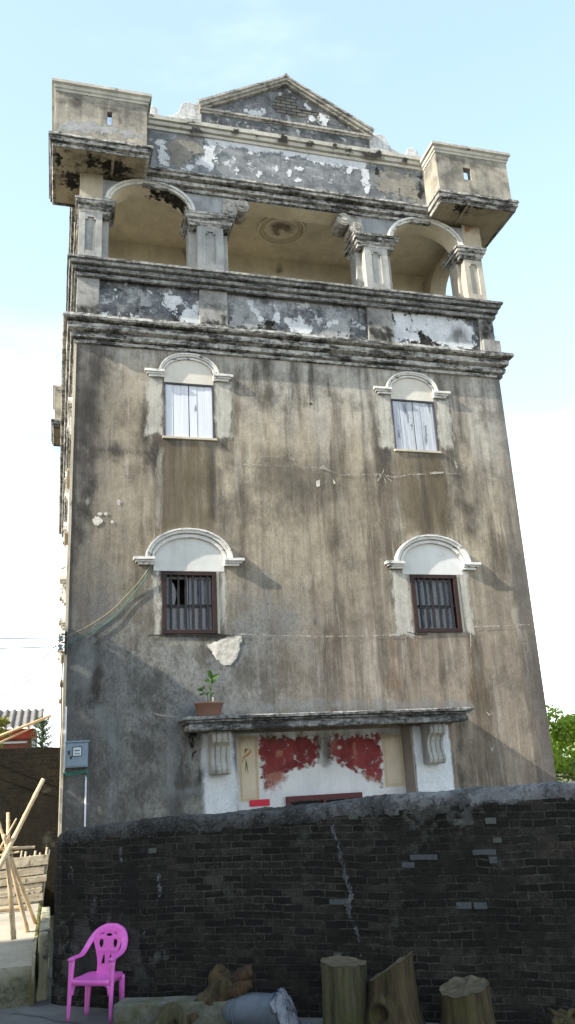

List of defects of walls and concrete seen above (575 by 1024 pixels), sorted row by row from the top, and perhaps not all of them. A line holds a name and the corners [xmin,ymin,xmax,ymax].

peeling [57,119,424,202]
flaking render [114,282,200,324]
peeling [229,300,355,338]
peeling [392,310,479,349]
water stain [66,348,120,461]
water stain [253,359,271,405]
water stain [142,414,221,529]
crack [244,456,459,483]
spalling [207,636,242,666]
water stain [167,733,197,784]
peeling [258,732,383,789]
crack [331,824,359,936]